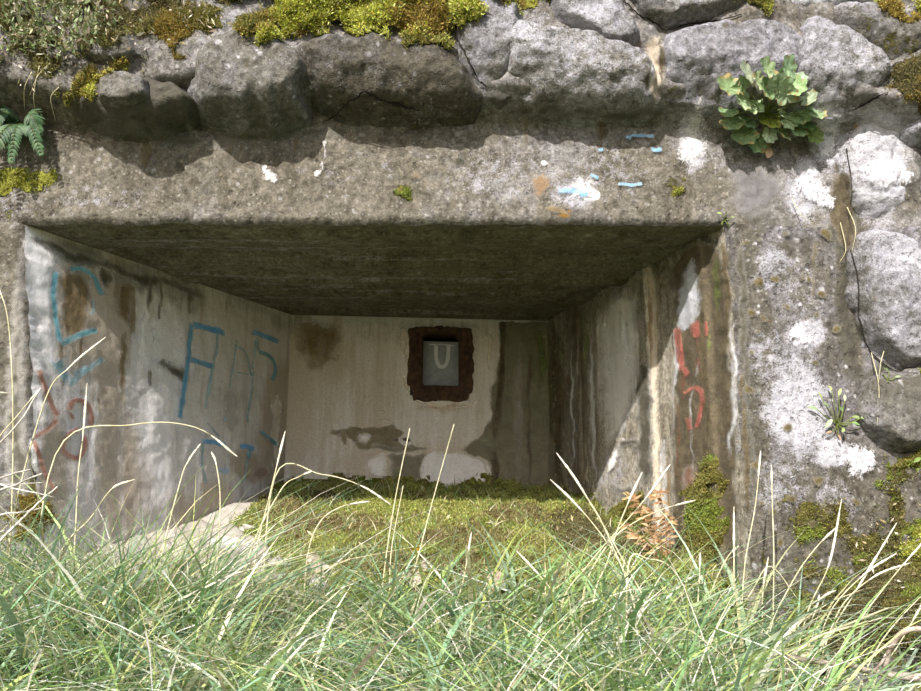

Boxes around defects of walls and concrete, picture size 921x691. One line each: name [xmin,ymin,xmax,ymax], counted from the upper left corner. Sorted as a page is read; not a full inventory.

damp [31,236,202,403]
damp [148,394,174,503]
damp [297,323,340,369]
spalling [331,317,569,488]
damp [560,298,596,500]
damp [601,300,638,446]
damp [644,243,750,580]